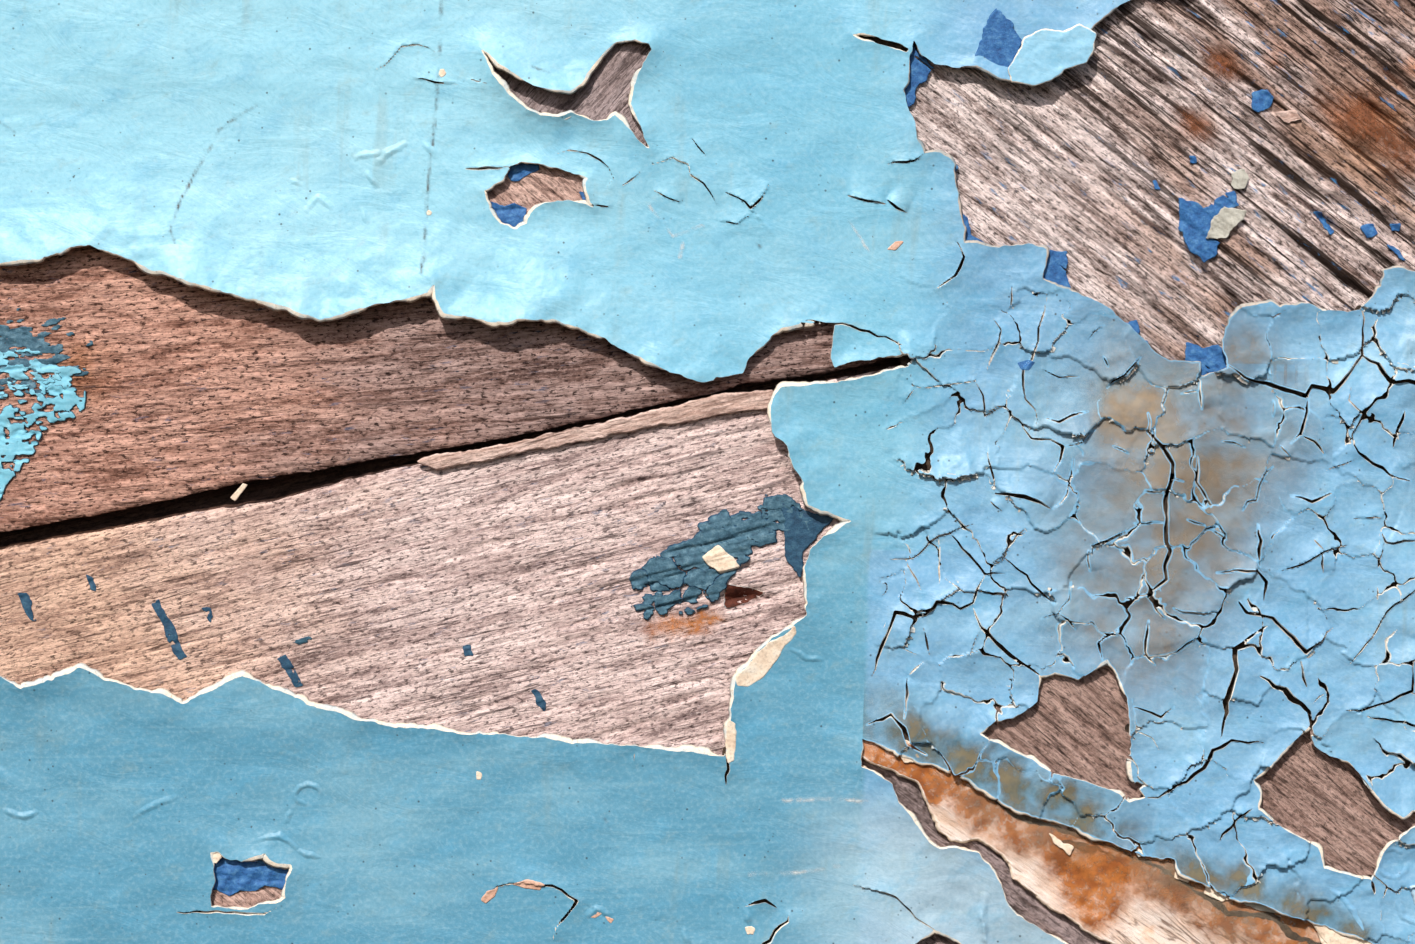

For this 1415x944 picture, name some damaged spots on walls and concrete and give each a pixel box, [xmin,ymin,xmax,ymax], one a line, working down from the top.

crack [466,164,510,172]
peeling [484,162,608,229]
peeling [481,39,652,148]
crack [558,139,769,225]
crack [937,242,965,303]
peeling [853,0,1415,377]
peeling [0,245,909,763]
crack [0,287,1415,944]
peeling [980,646,1156,808]
corrosion [863,739,1317,944]
peeling [861,739,1373,944]
peeling [1254,713,1415,886]